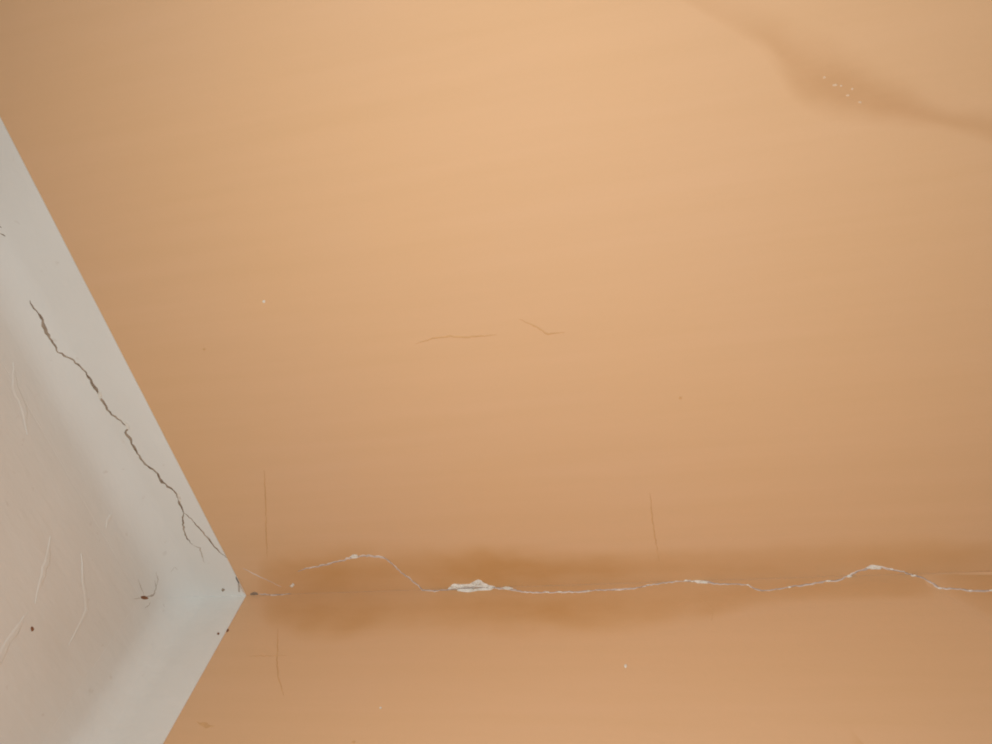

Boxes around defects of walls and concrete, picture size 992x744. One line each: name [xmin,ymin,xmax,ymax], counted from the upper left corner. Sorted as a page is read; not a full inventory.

crack [30,302,447,596]
crack [135,567,175,608]
crack [495,497,992,593]